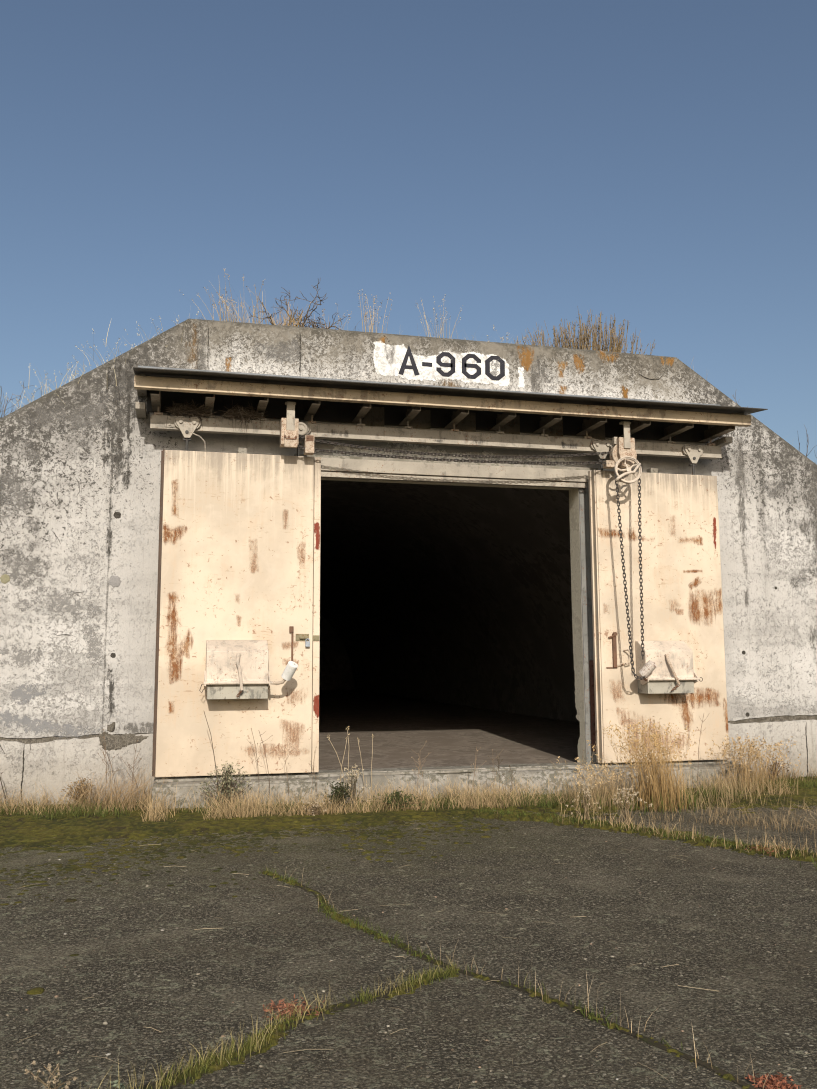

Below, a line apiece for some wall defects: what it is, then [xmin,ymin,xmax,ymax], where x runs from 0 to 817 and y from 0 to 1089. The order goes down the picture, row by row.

leakage [762,481,785,497]
corrosion [163,526,187,543]
leakage [734,438,748,607]
leakage [791,468,817,587]
corrosion [673,570,723,621]
corrosion [167,593,192,681]
crack [0,733,150,800]
corrosion [248,722,302,755]
crack [728,715,817,773]